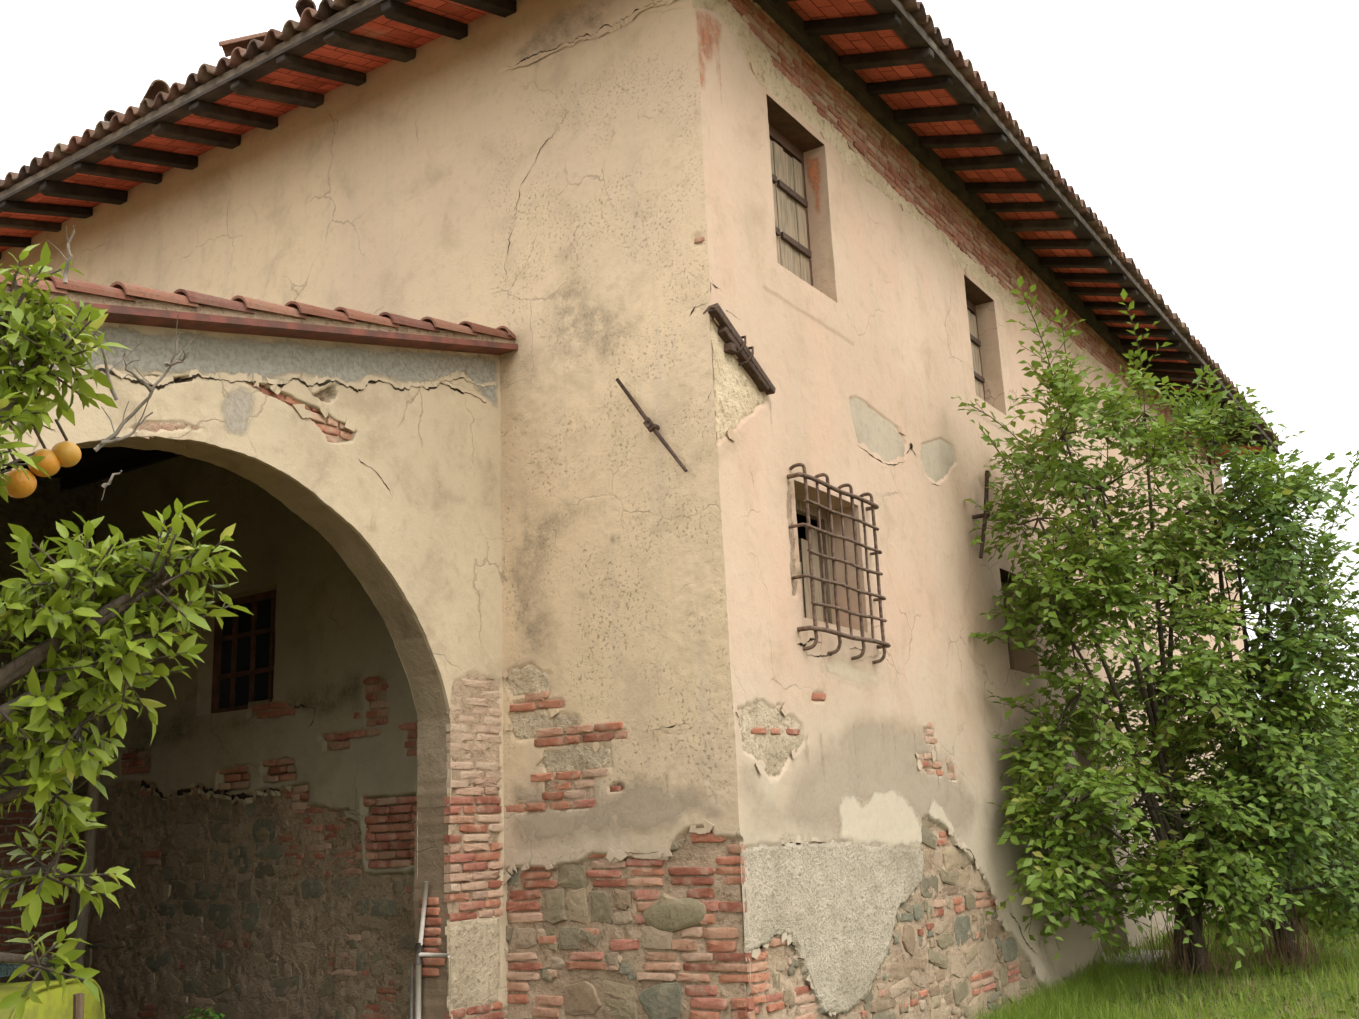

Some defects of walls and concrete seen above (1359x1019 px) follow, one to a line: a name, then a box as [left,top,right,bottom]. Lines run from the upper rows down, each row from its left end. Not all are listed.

crack [56,364,496,403]
spalling [246,380,355,443]
flaking render [693,0,1223,483]
flaking render [76,665,1042,1019]